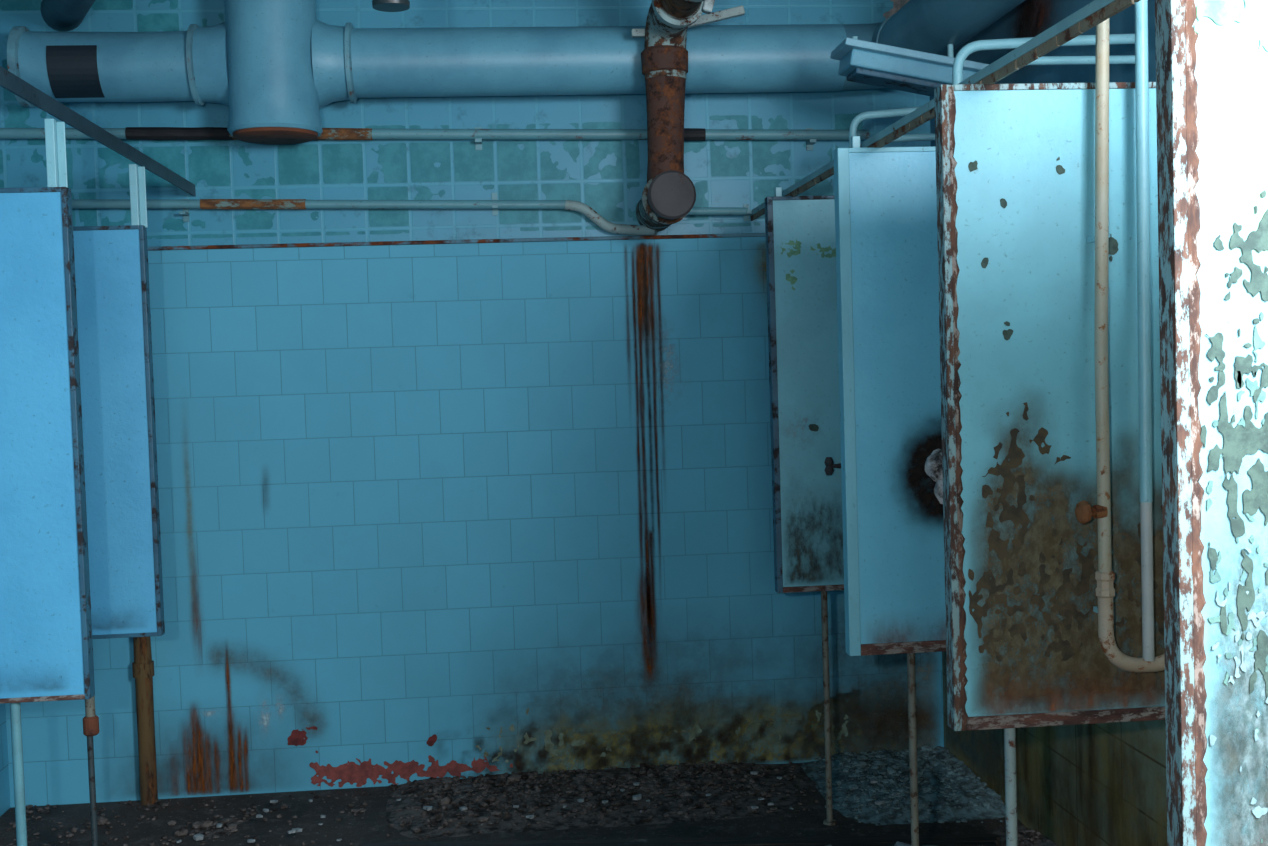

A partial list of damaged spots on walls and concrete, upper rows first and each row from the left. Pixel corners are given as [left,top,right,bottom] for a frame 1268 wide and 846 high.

peeling [1194,0,1252,34]
rust [627,243,663,677]
peeling [1200,190,1268,741]
rust [979,432,1165,704]
rust [185,650,248,794]
peeling [288,725,613,788]
damp [489,652,1051,829]
peeling [1250,797,1268,818]